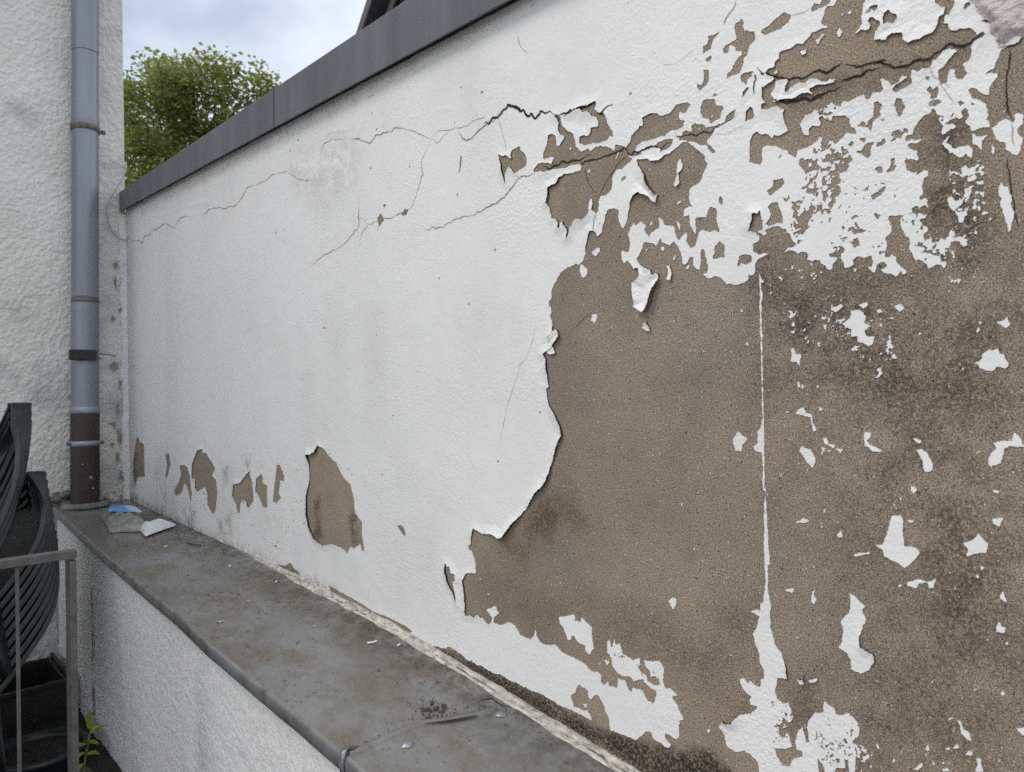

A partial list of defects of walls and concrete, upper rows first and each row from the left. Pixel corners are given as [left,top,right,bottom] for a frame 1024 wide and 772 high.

crack [753,20,1022,227]
crack [138,171,307,243]
crack [315,101,743,262]
peeling [434,0,1024,772]
peeling [166,450,219,514]
peeling [233,463,285,512]
peeling [293,446,364,553]